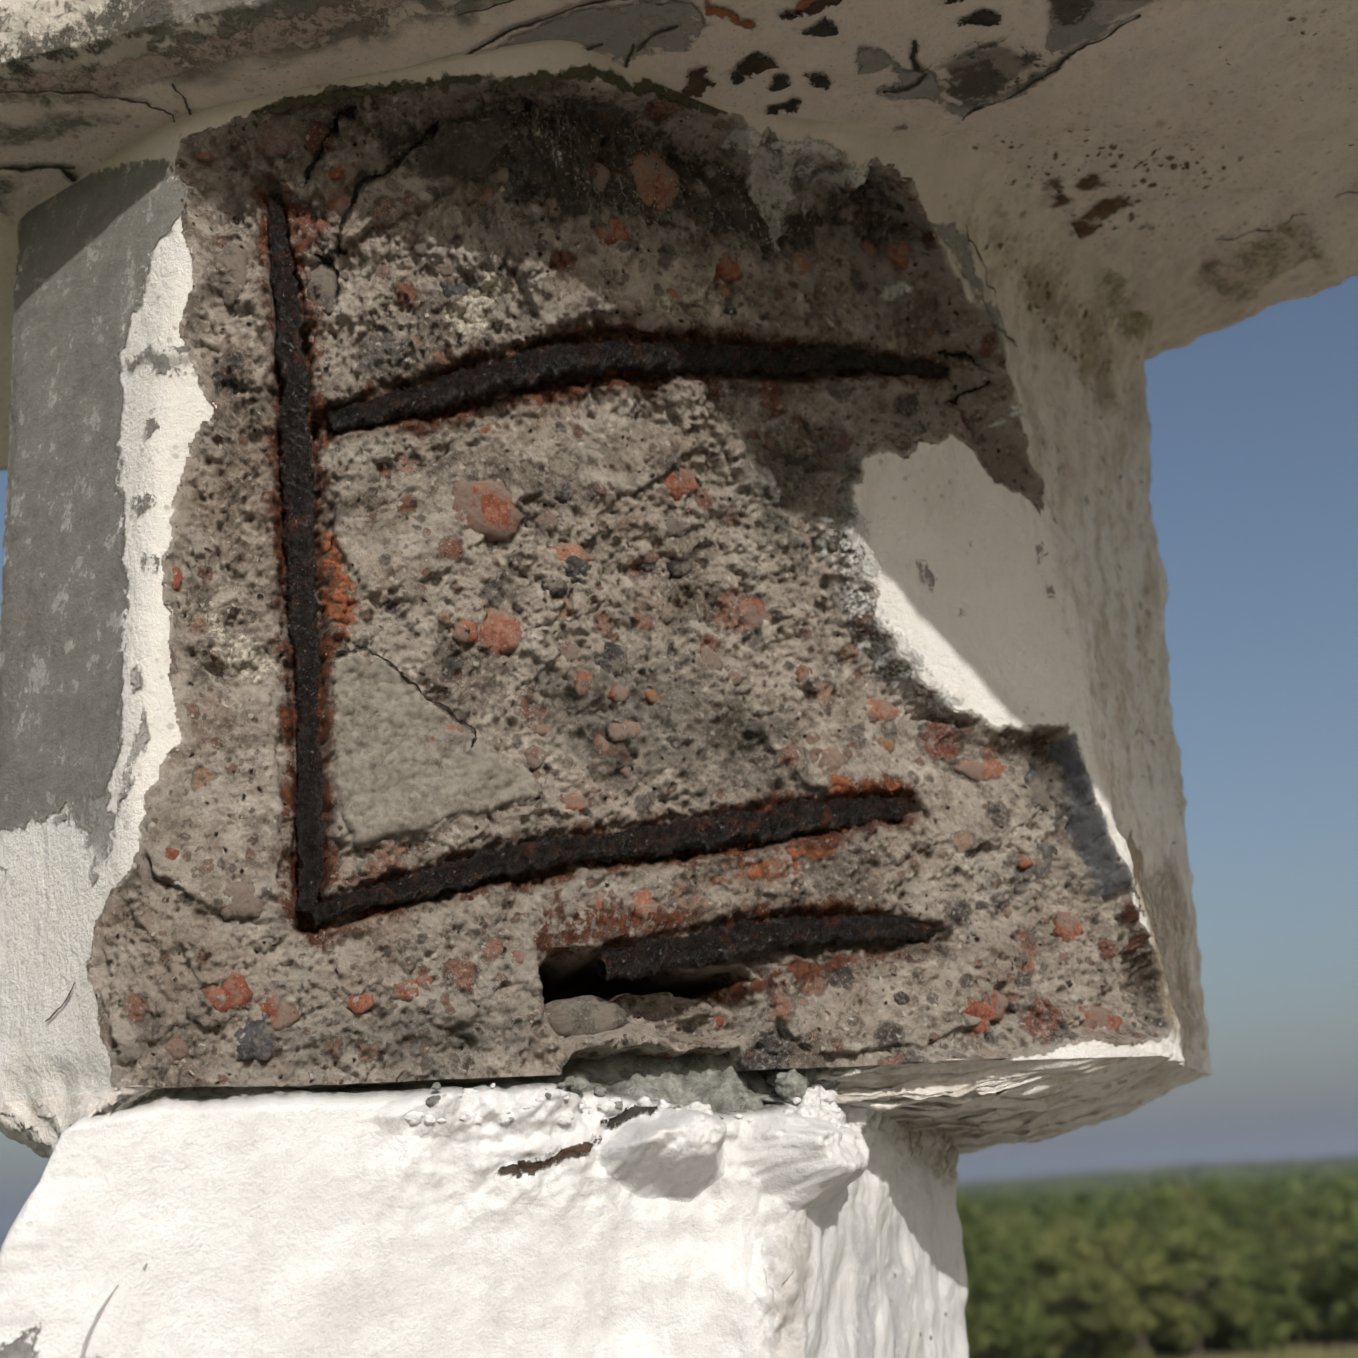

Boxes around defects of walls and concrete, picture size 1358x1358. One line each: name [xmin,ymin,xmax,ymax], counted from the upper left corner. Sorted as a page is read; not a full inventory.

mould [0,0,174,80]
peeling [0,0,403,102]
peeling [489,0,708,62]
peeling [779,0,842,37]
peeling [855,0,1132,118]
crack [305,105,357,184]
crack [314,121,438,293]
crack [1216,214,1306,241]
spalling [0,51,1175,1129]
corrosion [251,186,950,970]
crack [336,647,477,748]
corrosion [683,943,928,1005]